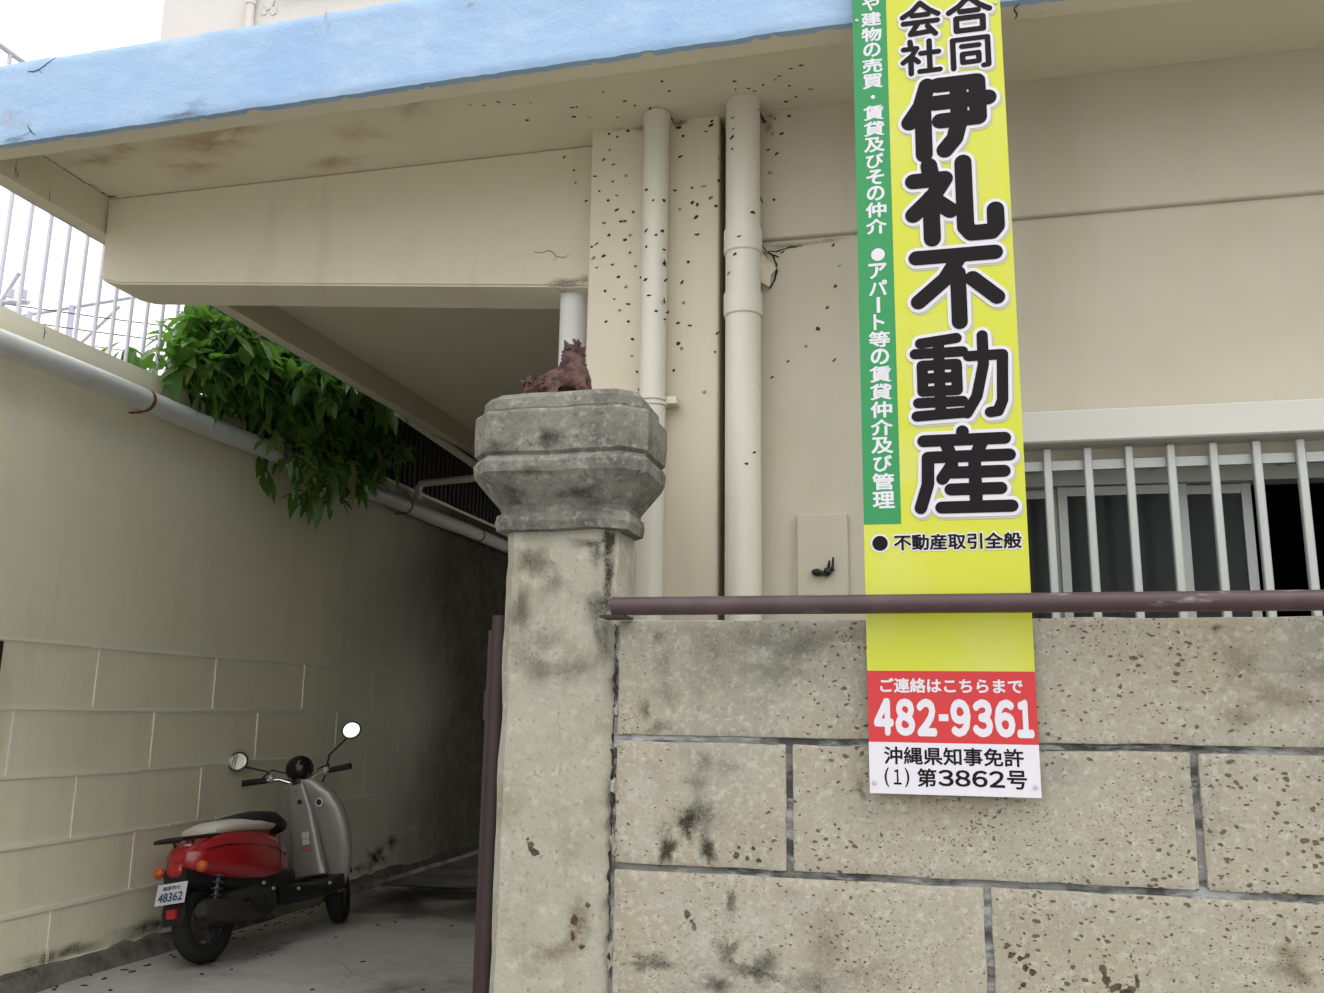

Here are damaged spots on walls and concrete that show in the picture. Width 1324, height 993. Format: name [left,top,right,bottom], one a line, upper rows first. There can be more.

crack [762,245,802,289]
damp [582,528,614,620]
damp [660,810,714,862]